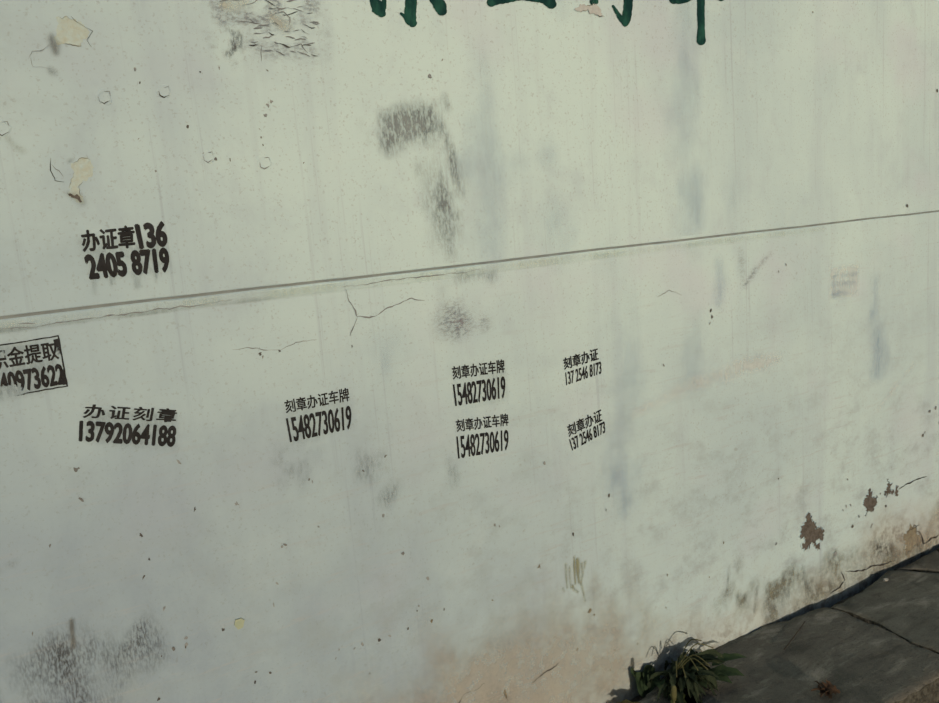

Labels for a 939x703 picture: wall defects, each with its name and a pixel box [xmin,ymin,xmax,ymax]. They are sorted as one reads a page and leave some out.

peeling [240,0,320,71]
peeling [50,157,95,204]
crack [342,269,477,335]
peeling [843,478,899,528]
peeling [799,512,825,552]